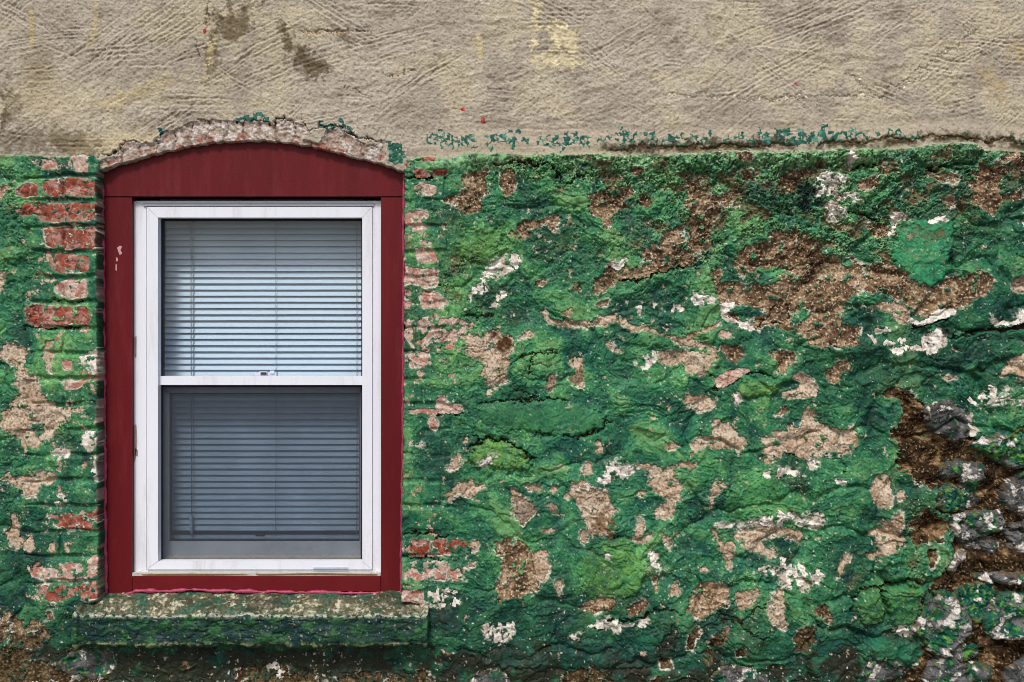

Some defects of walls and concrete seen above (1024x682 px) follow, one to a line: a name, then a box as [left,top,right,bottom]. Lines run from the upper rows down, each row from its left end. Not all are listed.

damp [204,2,249,72]
damp [273,22,328,81]
spalling [0,119,388,390]
peeling [403,211,535,397]
peeling [0,343,84,459]
crack [437,349,565,416]
crack [470,421,611,461]
spalling [508,167,993,682]
spalling [0,512,116,682]
flaking render [402,538,480,609]
spalling [494,537,564,604]
spalling [863,352,1024,682]